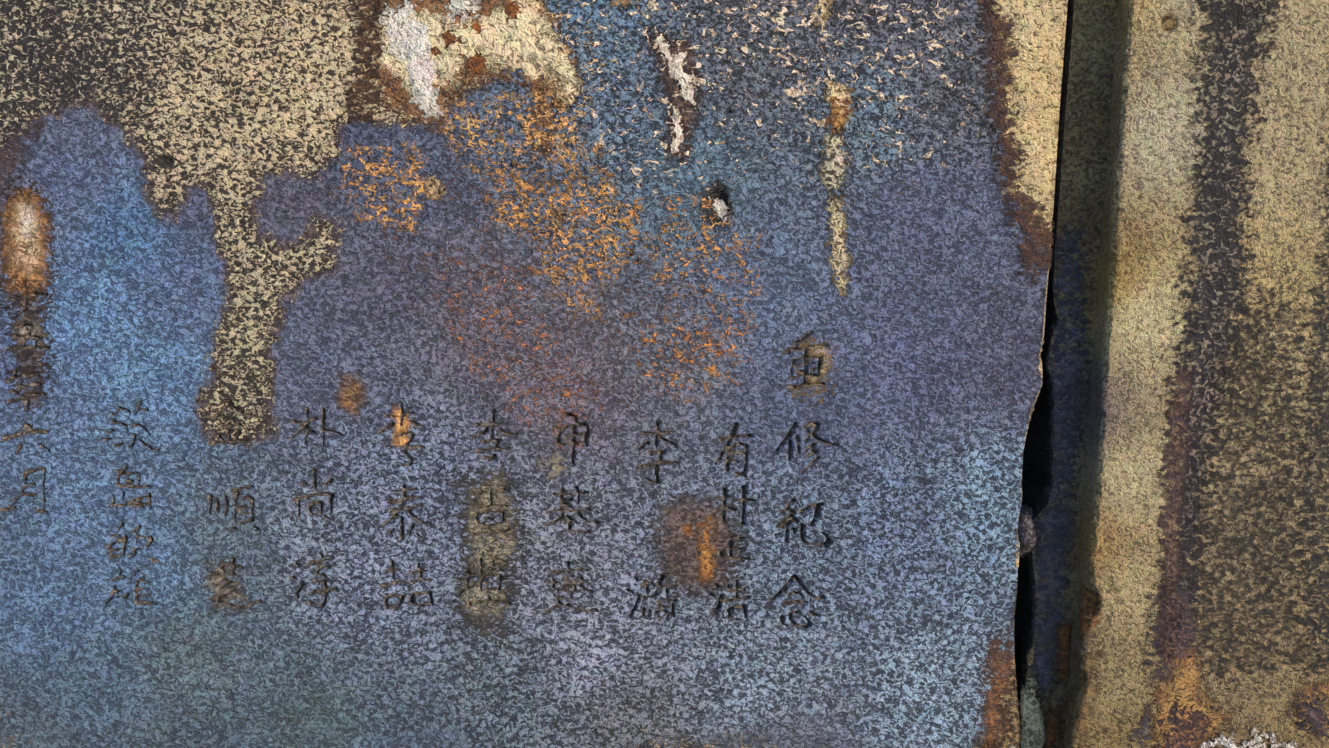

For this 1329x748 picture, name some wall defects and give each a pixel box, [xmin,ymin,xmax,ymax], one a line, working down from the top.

rust [0,121,43,208]
rust [326,0,762,451]
spalling [365,0,987,228]
crack [1021,0,1074,519]
damp [1148,0,1329,692]
rust [649,493,742,602]
crack [1014,551,1036,722]
rust [1128,369,1237,748]